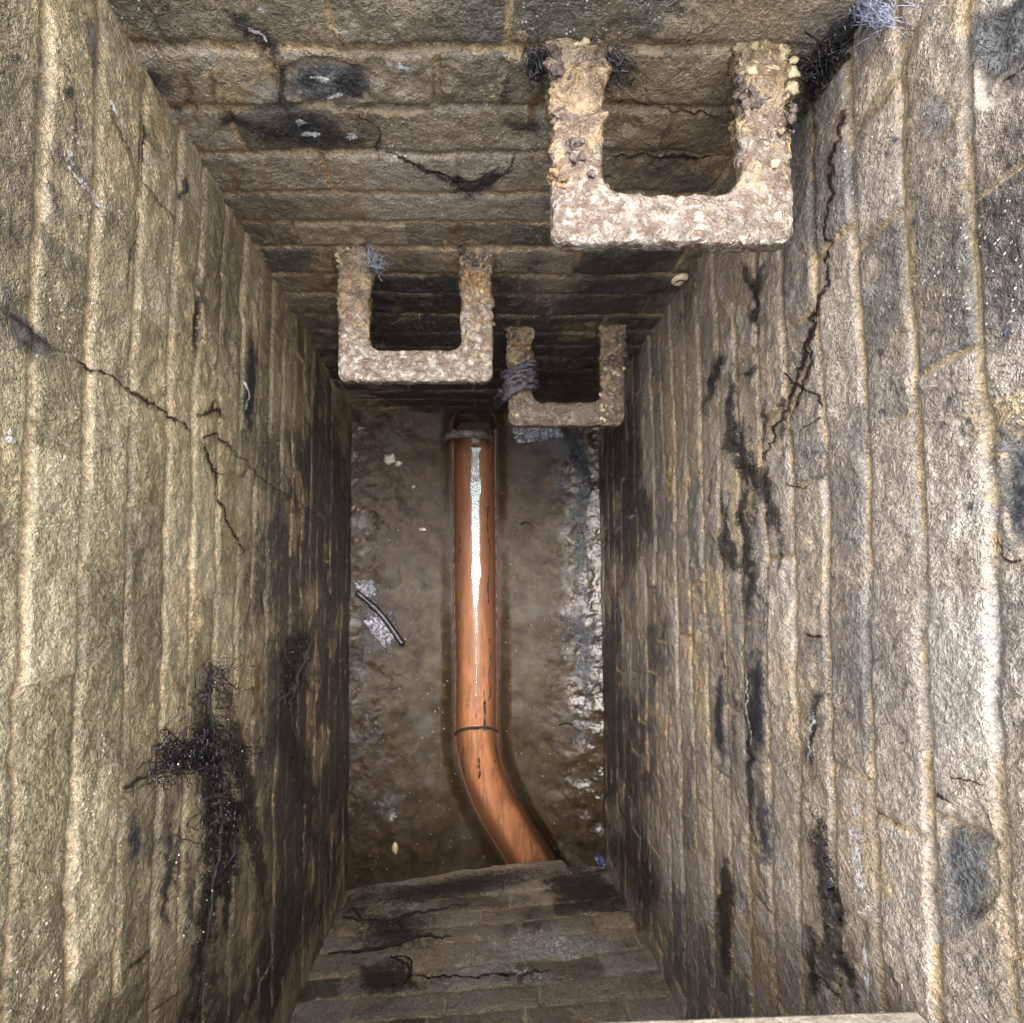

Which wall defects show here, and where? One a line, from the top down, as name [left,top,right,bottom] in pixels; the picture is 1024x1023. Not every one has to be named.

leakage [206,8,481,151]
crack [347,108,461,189]
leakage [585,2,738,59]
leakage [739,257,766,336]
crack [762,109,848,461]
crack [10,314,314,556]
leakage [701,354,789,864]
leakage [127,816,142,860]
leakage [159,673,268,1023]
crack [390,955,551,986]
leakage [716,857,735,994]
leakage [805,801,870,1004]